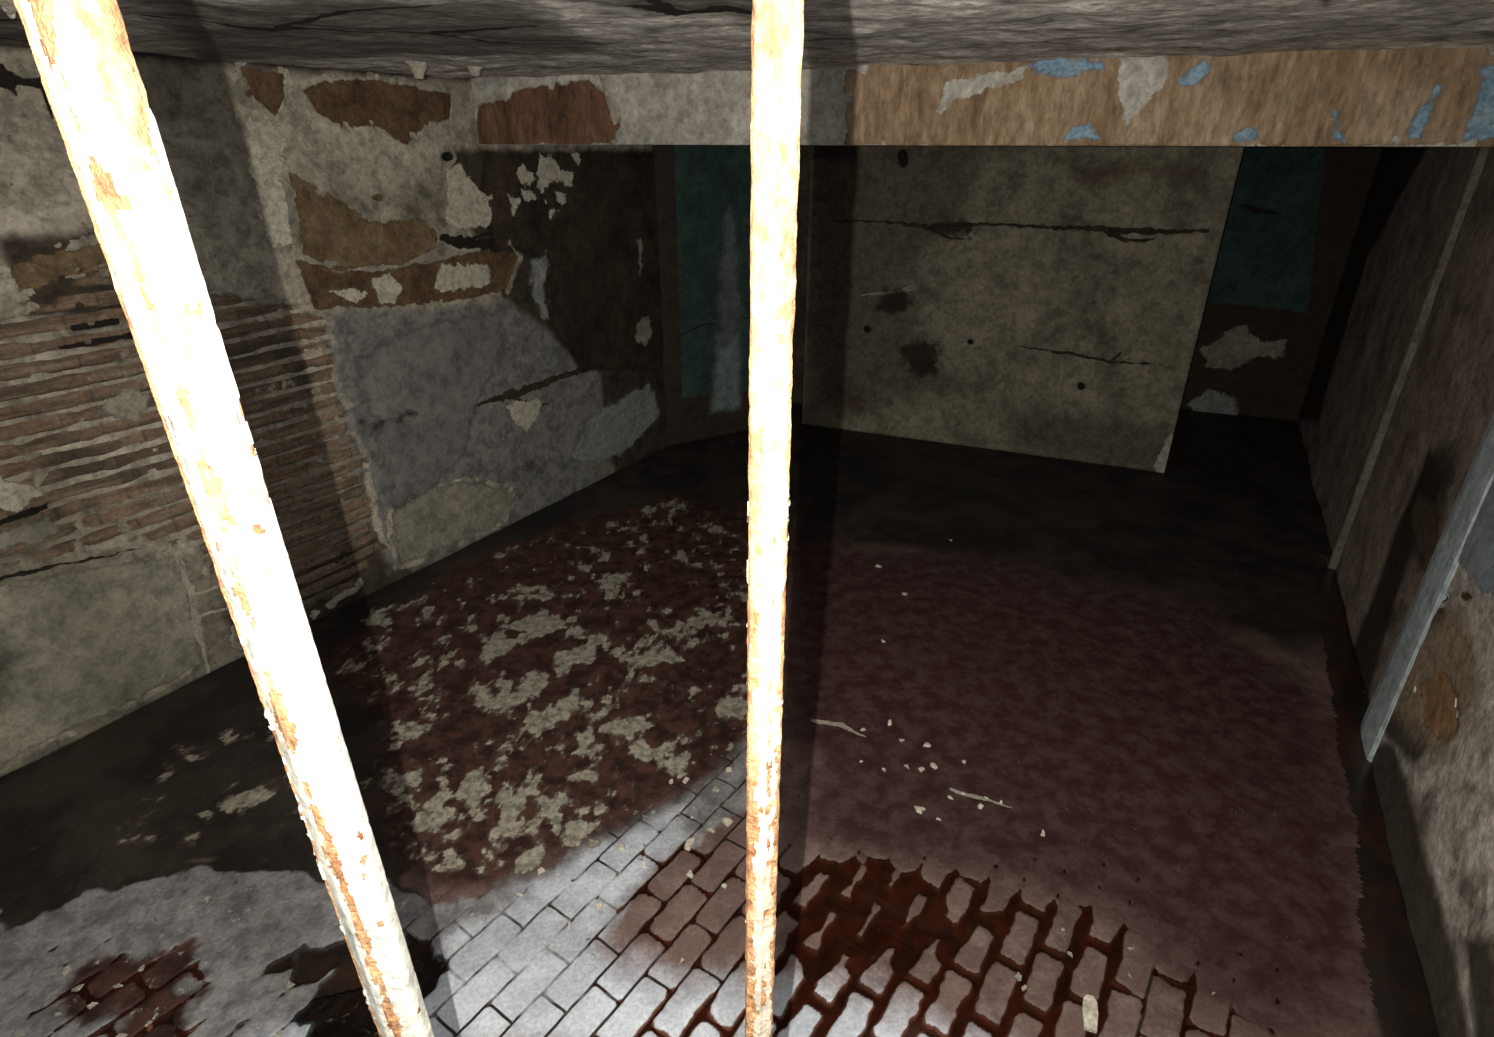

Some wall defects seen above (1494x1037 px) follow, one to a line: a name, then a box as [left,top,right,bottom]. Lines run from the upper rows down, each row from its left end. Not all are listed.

crack [0,19,53,119]
peeling [473,74,627,219]
peeling [838,47,1494,147]
crack [834,220,1210,243]
peeling [635,316,653,345]
peeling [0,0,549,1037]
peeling [1458,478,1494,597]
crack [0,548,228,673]